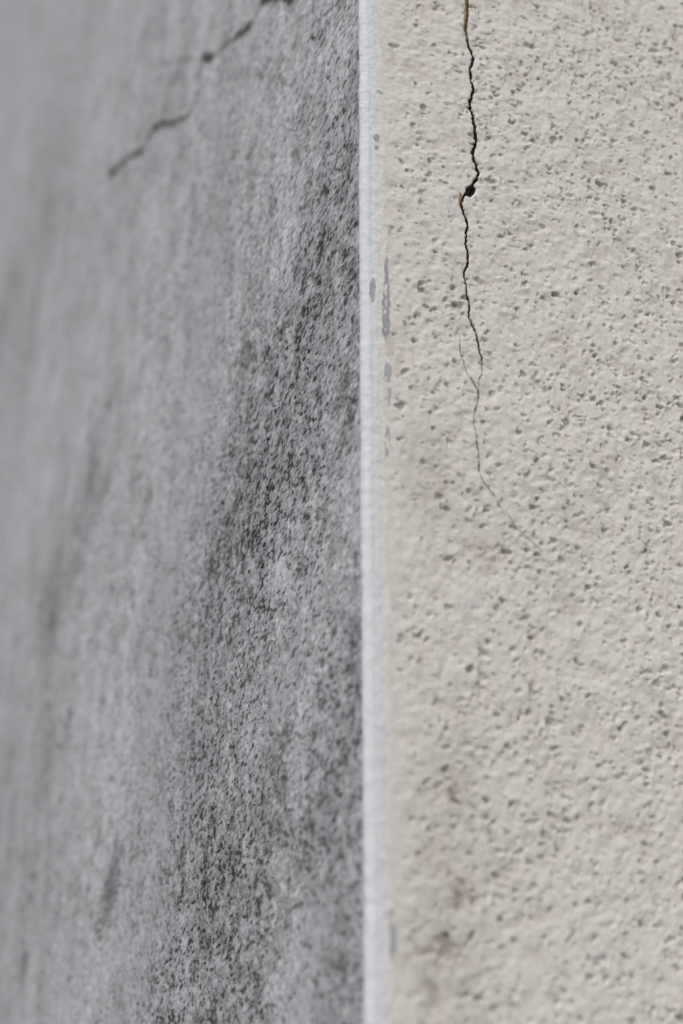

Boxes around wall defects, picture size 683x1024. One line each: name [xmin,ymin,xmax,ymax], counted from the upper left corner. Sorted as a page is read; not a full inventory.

crack [202,0,292,62]
crack [107,94,197,179]
crack [438,0,541,550]